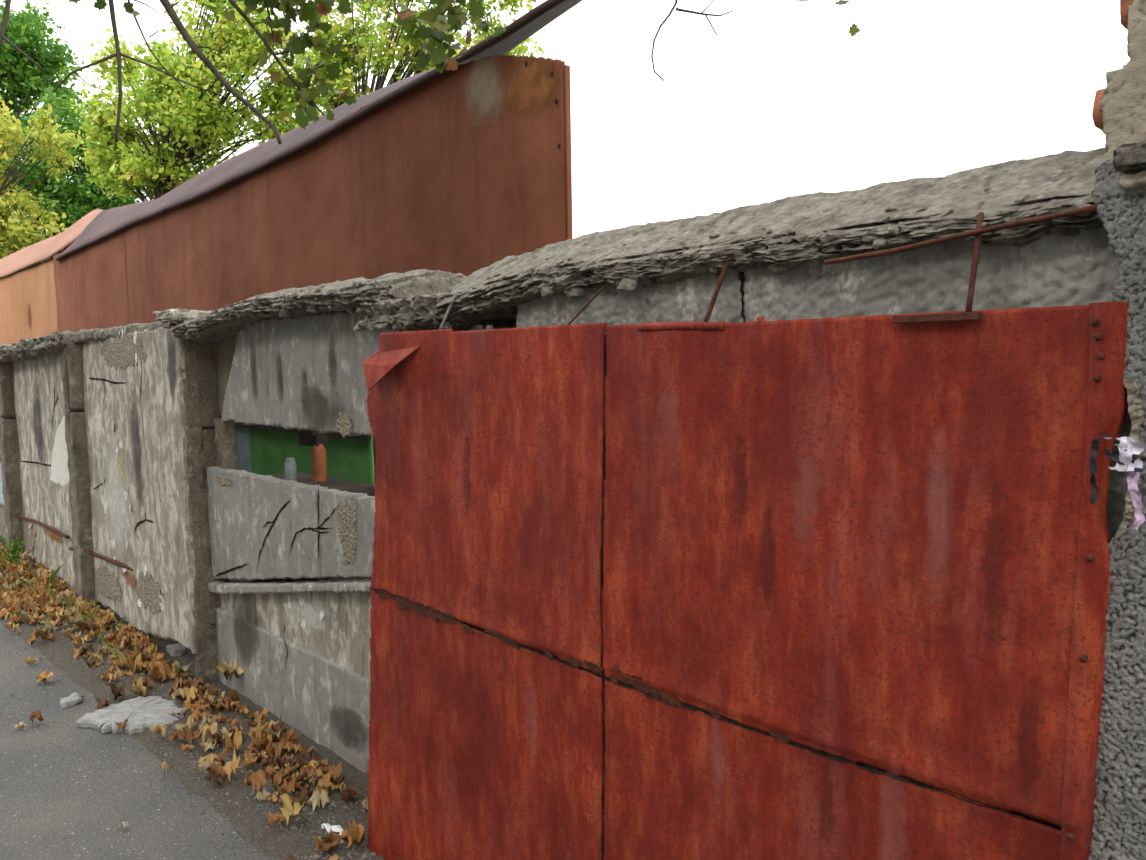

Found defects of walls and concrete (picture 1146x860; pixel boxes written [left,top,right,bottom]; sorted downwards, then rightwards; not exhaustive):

rust [824,205,1097,265]
rust [16,515,73,551]
crack [216,482,336,576]
rust [88,551,136,590]
rust [369,588,520,651]
rust [566,656,683,708]